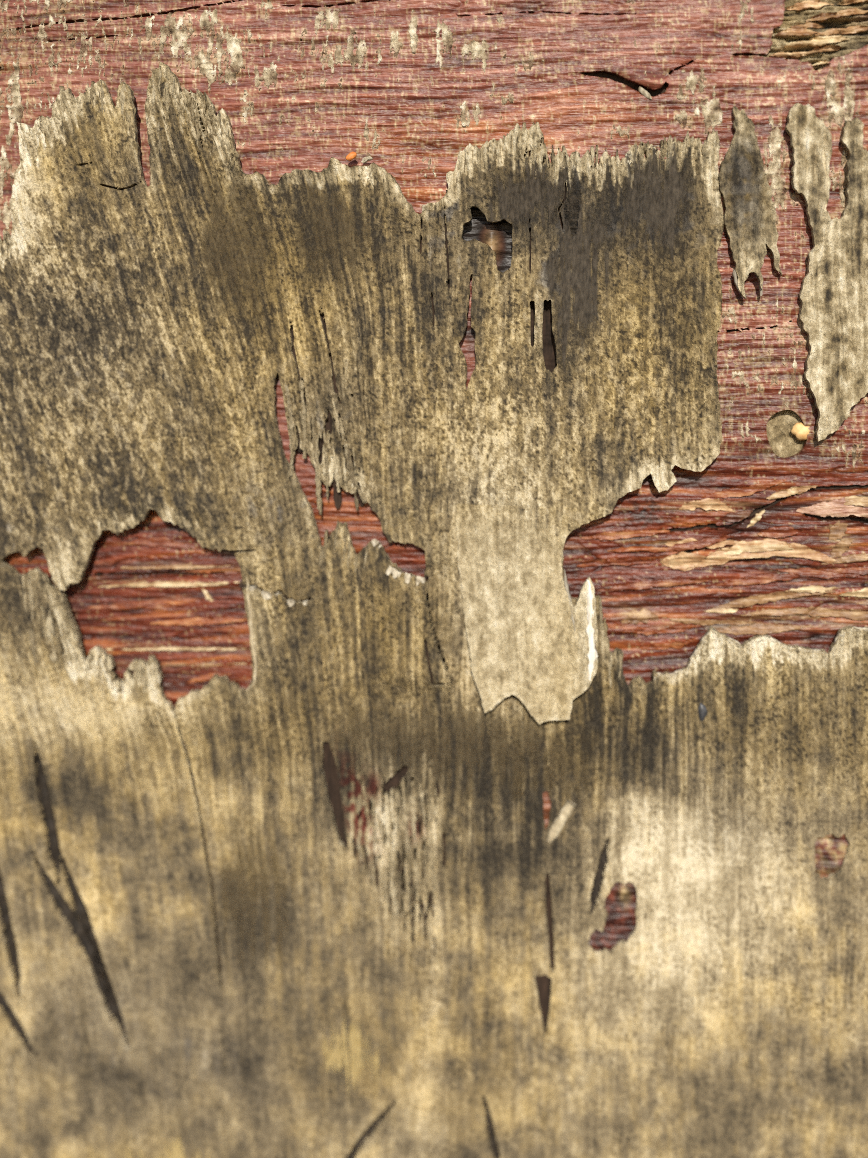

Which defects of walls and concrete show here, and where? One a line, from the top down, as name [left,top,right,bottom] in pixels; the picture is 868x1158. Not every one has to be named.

crack [526,219,534,273]
crack [558,182,567,230]
peeling [0,0,868,725]
crack [323,741,345,842]
crack [383,765,409,792]
crack [174,708,223,987]
peeling [589,838,637,951]
peeling [815,833,849,879]
crack [535,873,554,1034]